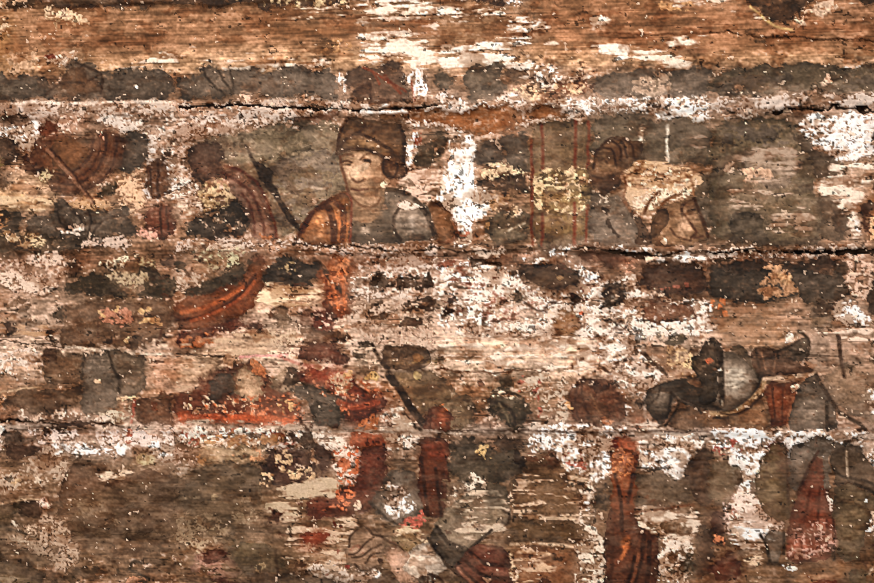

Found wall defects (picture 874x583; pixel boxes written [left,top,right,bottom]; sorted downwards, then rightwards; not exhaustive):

peeling [746,0,818,26]
crack [179,103,438,114]
peeling [0,53,874,270]
peeling [53,139,322,351]
crack [350,244,449,252]
crack [573,246,874,261]
peeling [511,262,583,304]
peeling [0,386,95,433]
peeling [130,392,176,428]
peeling [601,255,874,582]
peeling [290,338,534,551]
peeling [175,444,333,554]